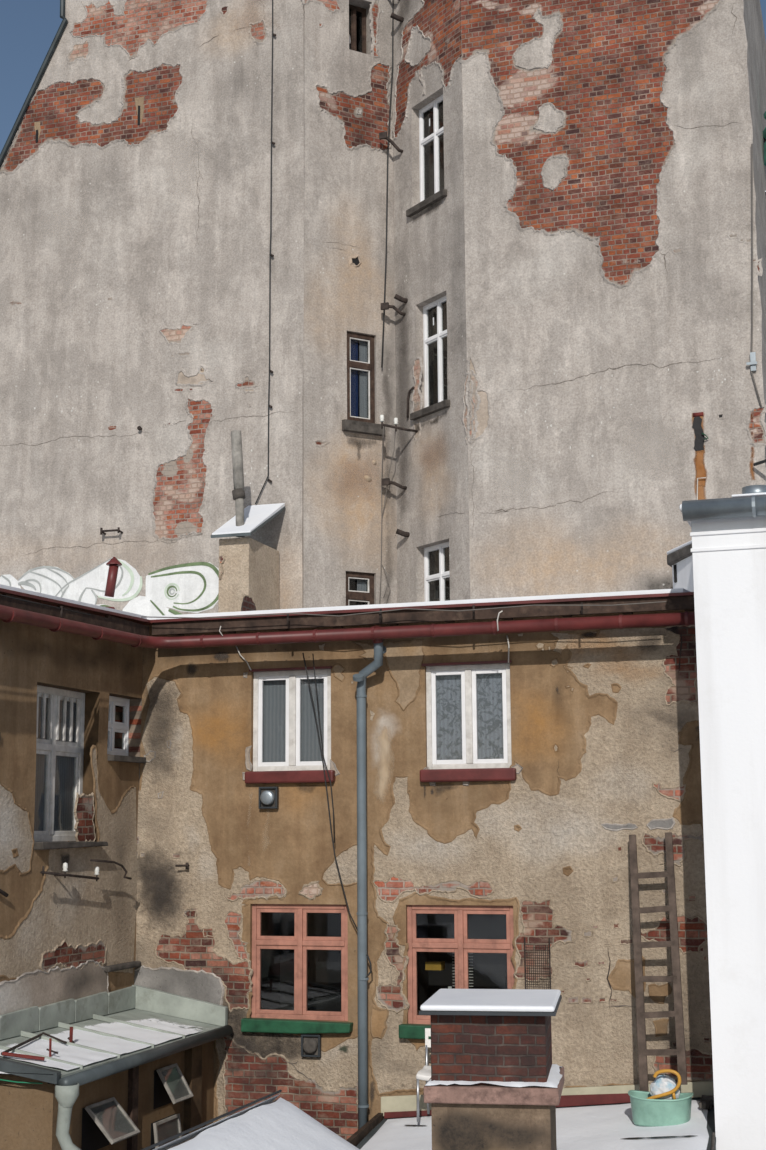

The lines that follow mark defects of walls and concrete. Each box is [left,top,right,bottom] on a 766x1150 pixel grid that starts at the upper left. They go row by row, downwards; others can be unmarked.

spalling [0,0,230,175]
spalling [247,19,270,46]
spalling [314,0,723,289]
spalling [150,322,216,543]
corrosion [692,412,706,500]
peeling [0,625,713,1140]